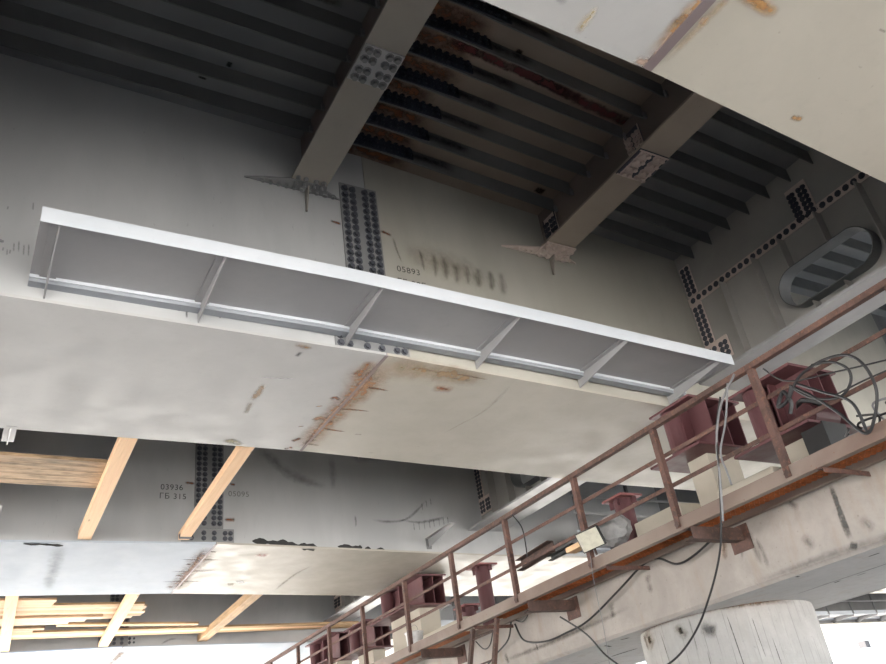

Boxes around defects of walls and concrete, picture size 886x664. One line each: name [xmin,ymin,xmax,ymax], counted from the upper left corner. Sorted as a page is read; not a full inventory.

corrosion [508,17,549,37]
corrosion [284,363,385,449]
corrosion [169,551,212,585]